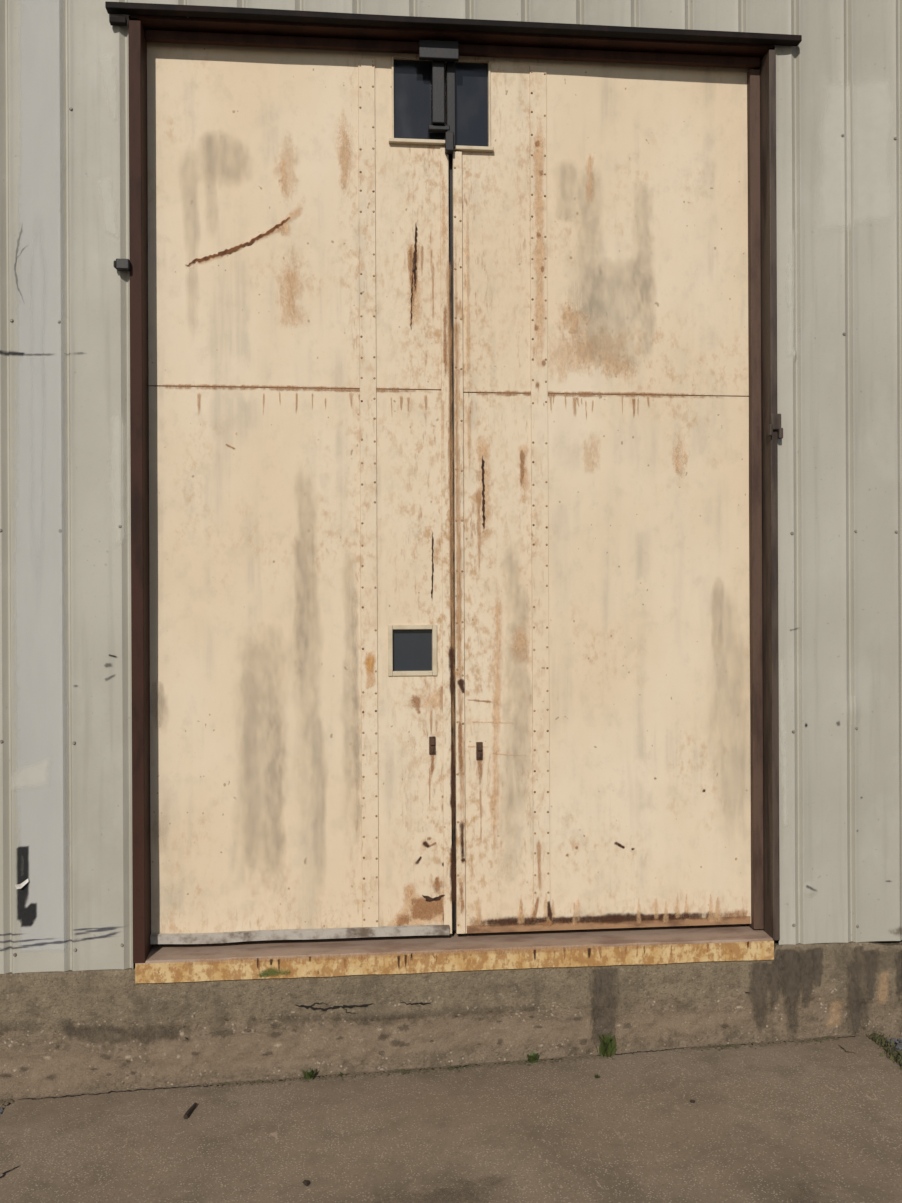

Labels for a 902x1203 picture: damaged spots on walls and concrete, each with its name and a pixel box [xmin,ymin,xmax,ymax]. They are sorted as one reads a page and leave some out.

rust [408,247,423,303]
rust [165,385,360,409]
rust [485,383,684,416]
rust [432,267,482,910]
rust [473,898,746,926]
rust [230,954,369,969]
rust [393,945,601,967]
water stain [592,968,616,1044]
water stain [751,948,823,1030]
water stain [838,947,902,1034]